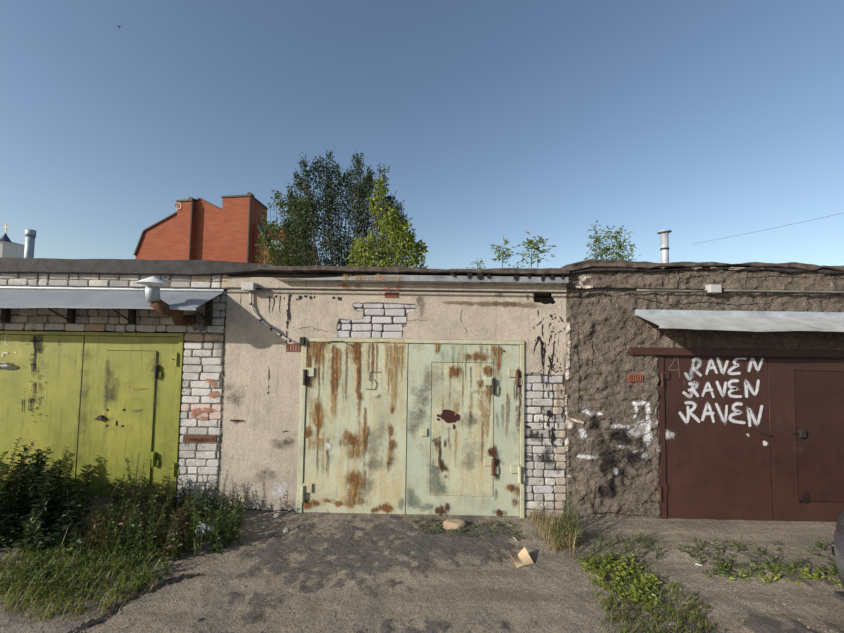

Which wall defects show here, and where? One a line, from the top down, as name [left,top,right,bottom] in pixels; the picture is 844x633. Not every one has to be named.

peeling [336,302,416,338]
spalling [533,293,555,304]
crack [620,270,810,307]
rust [303,342,404,509]
rust [433,344,505,480]
rust [506,369,522,431]